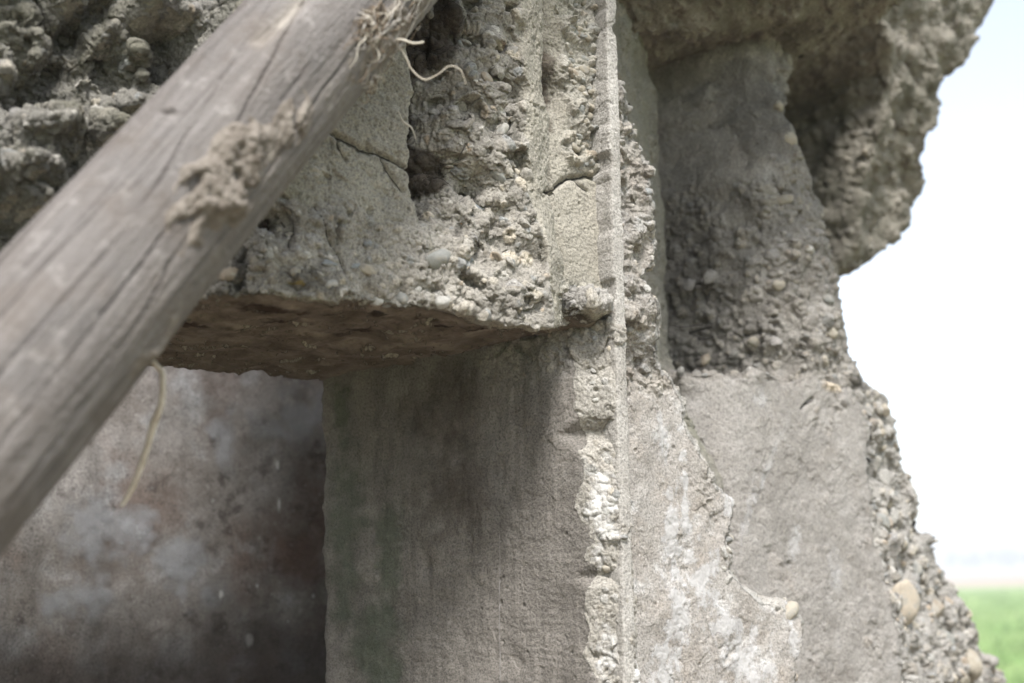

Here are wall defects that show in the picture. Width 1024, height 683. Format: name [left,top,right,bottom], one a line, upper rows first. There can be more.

spalling [0,0,237,252]
crack [330,134,402,192]
spalling [202,0,555,332]
crack [546,176,591,193]
spalling [568,0,597,175]
spalling [618,37,1007,683]
spalling [567,316,640,683]